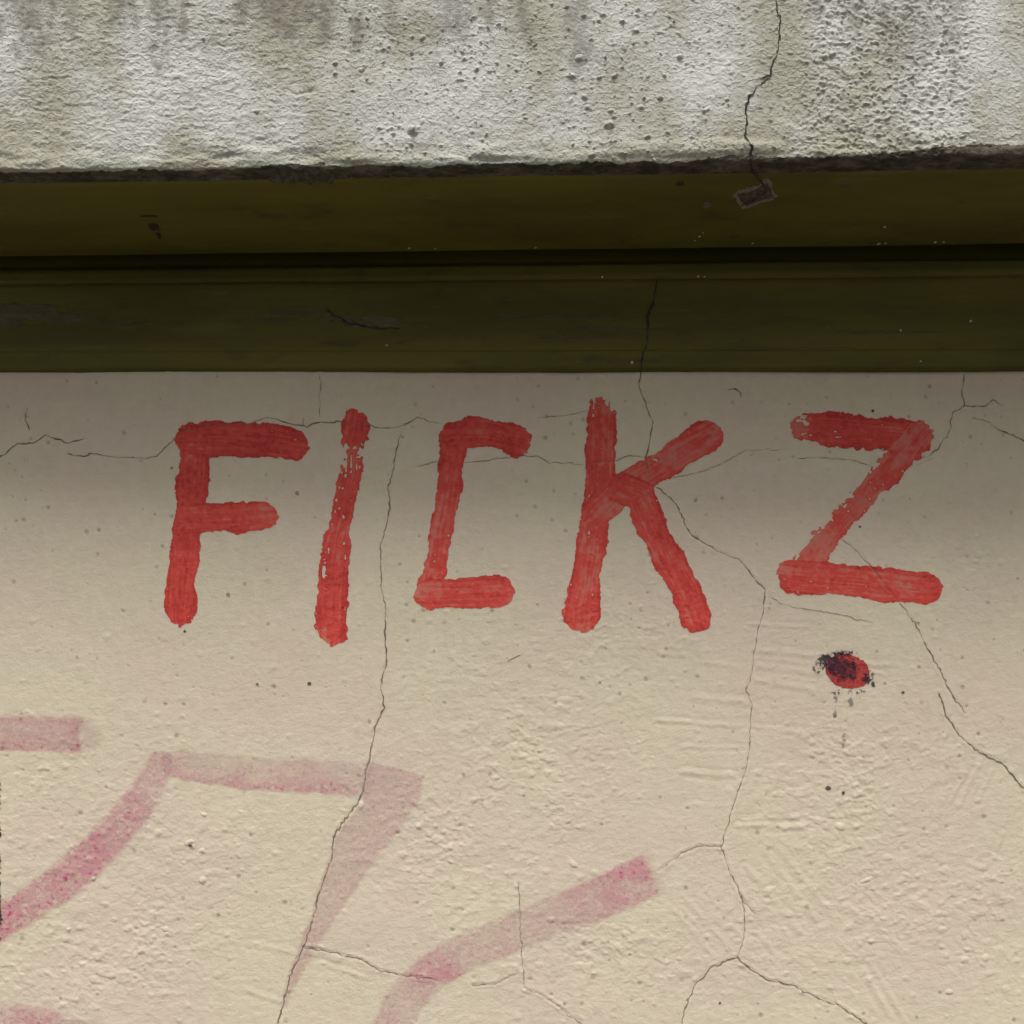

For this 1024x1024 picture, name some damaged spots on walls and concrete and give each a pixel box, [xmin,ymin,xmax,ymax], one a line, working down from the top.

spalling [733,178,778,209]
crack [744,1,781,191]
crack [921,377,1024,464]
crack [0,377,443,1023]
crack [472,281,874,1024]
crack [843,540,1024,788]